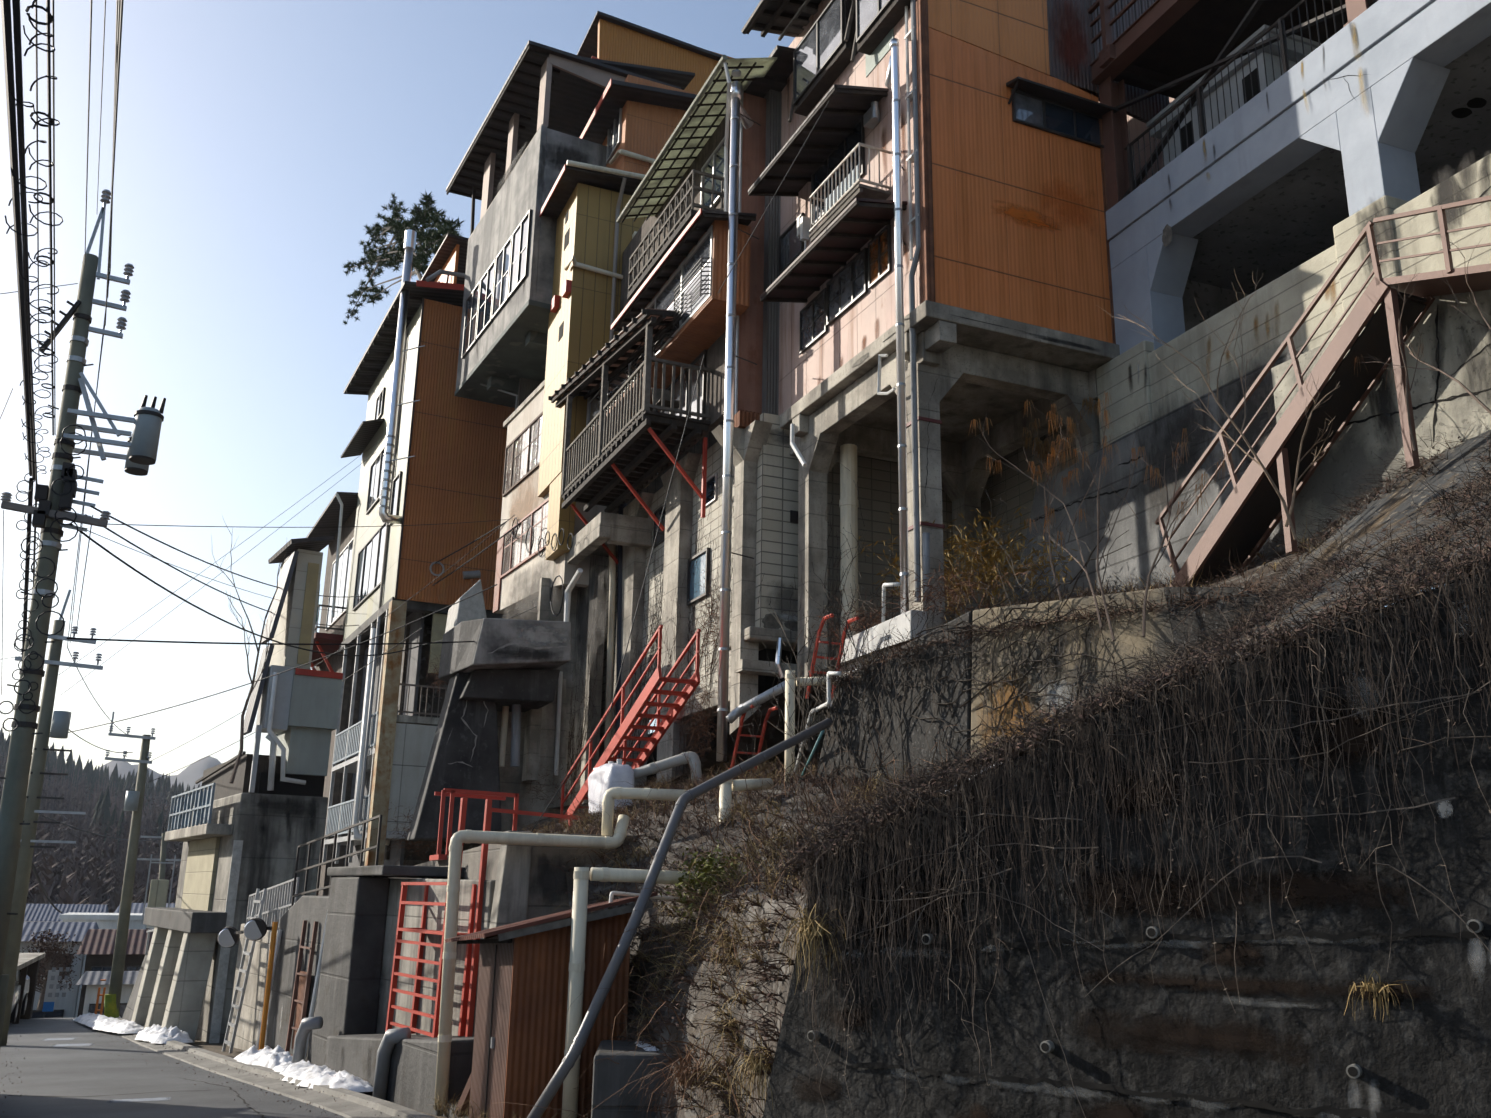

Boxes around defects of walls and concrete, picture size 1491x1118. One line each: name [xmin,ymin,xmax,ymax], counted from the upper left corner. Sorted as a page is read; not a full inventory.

crack [1346,305,1491,442]
crack [447,701,488,767]